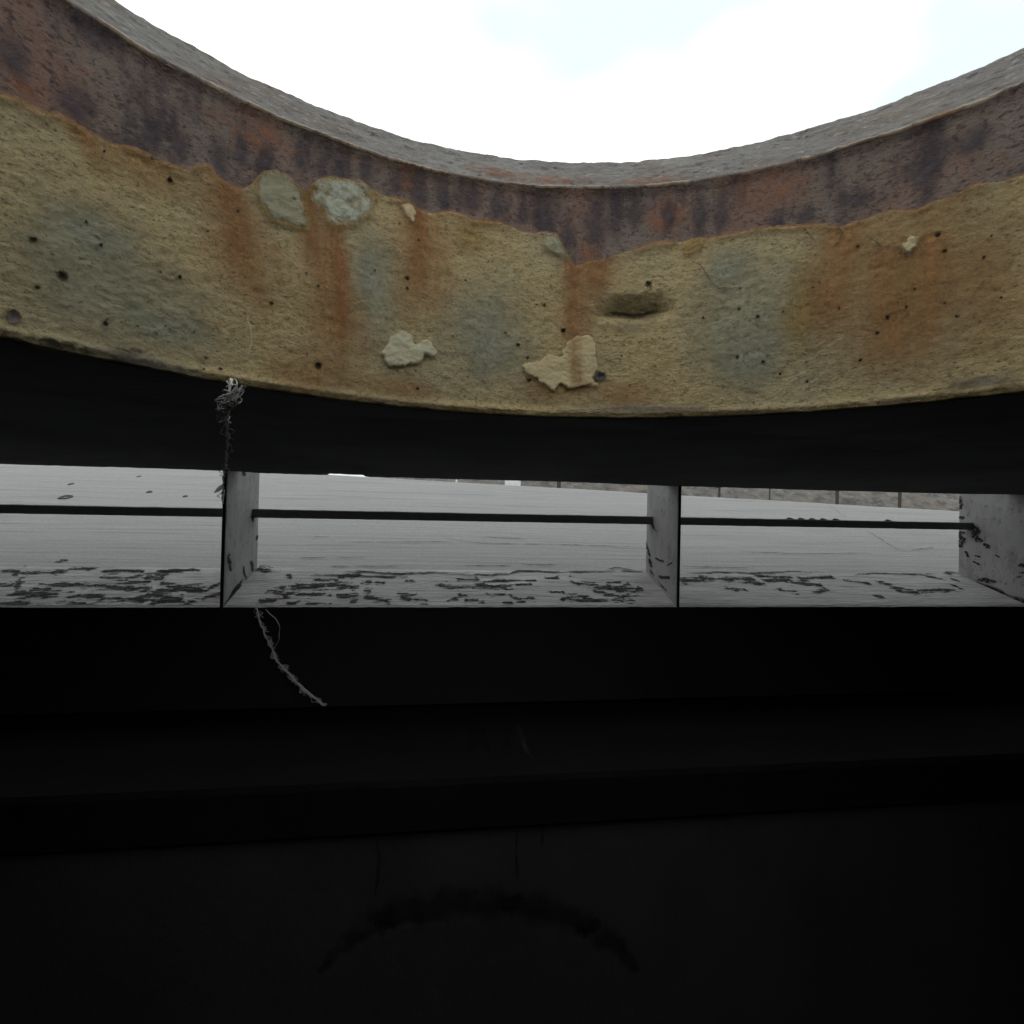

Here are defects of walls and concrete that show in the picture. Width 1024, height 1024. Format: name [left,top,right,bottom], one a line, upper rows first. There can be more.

peeling [257,169,375,228]
peeling [900,235,919,255]
peeling [381,331,438,366]
peeling [522,328,606,392]